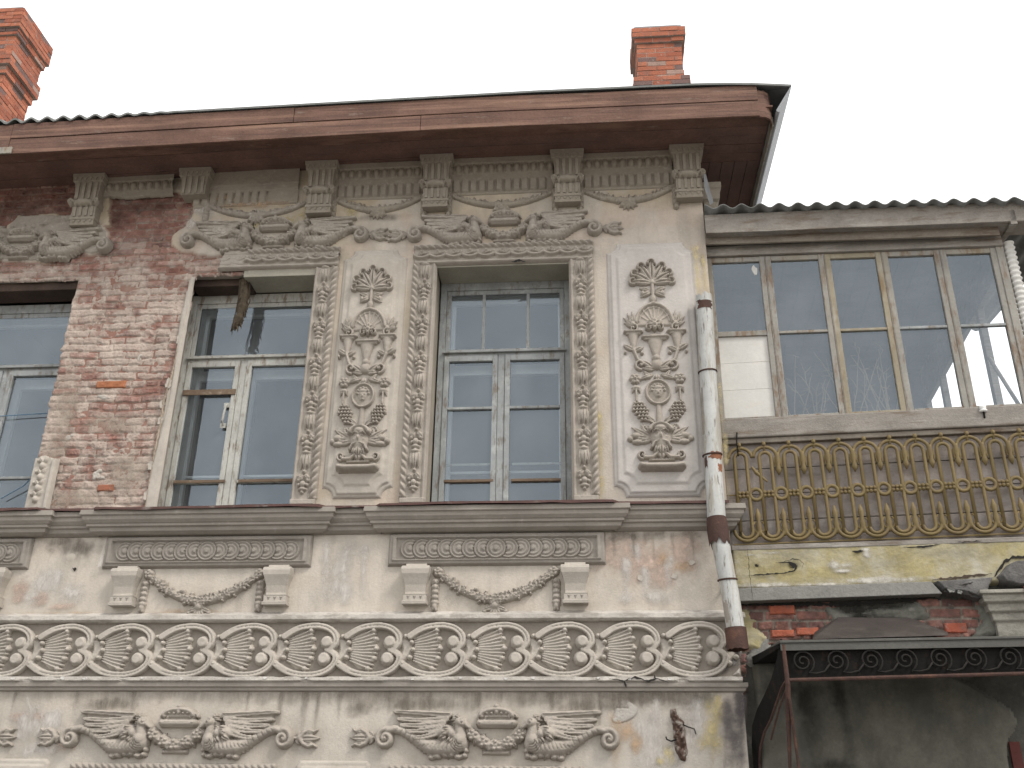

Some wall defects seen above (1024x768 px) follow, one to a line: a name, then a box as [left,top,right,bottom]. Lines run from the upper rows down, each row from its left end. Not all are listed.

flaking render [0,185,75,227]
flaking render [0,193,244,509]
crack [741,550,1024,607]
flaking render [741,602,840,645]
flaking render [916,587,983,637]